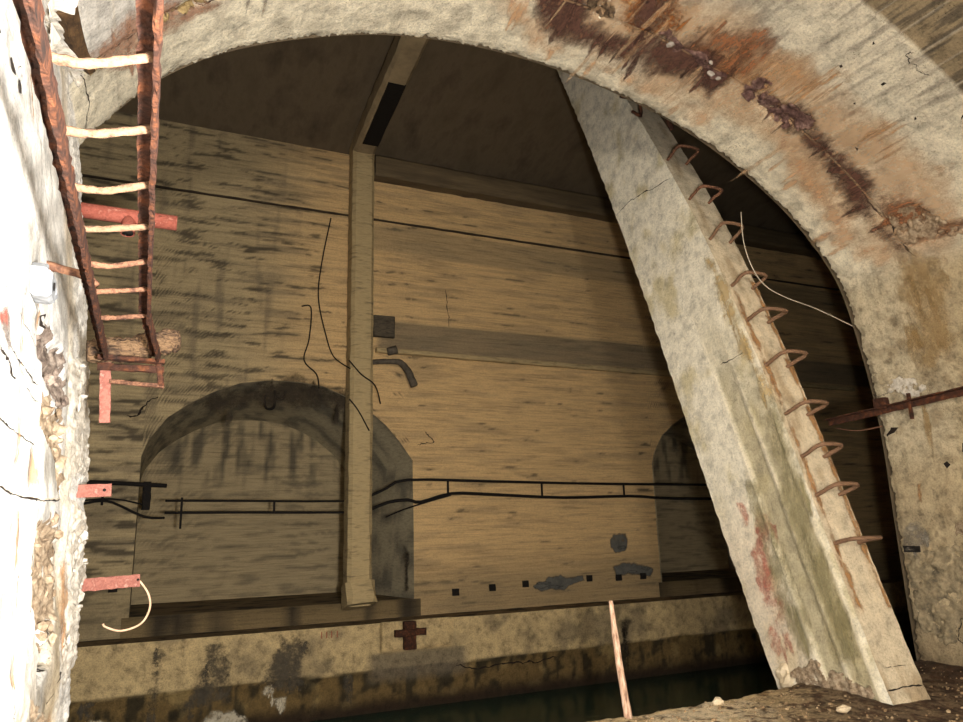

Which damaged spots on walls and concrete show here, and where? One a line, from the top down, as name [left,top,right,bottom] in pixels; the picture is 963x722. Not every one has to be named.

corrosion [506,0,963,253]
spalling [889,206,963,246]
crack [0,279,43,405]
spalling [36,323,90,498]
spalling [905,514,963,646]
spalling [30,698,47,722]
damp [184,644,245,722]
damp [262,639,310,713]
damp [622,620,631,667]